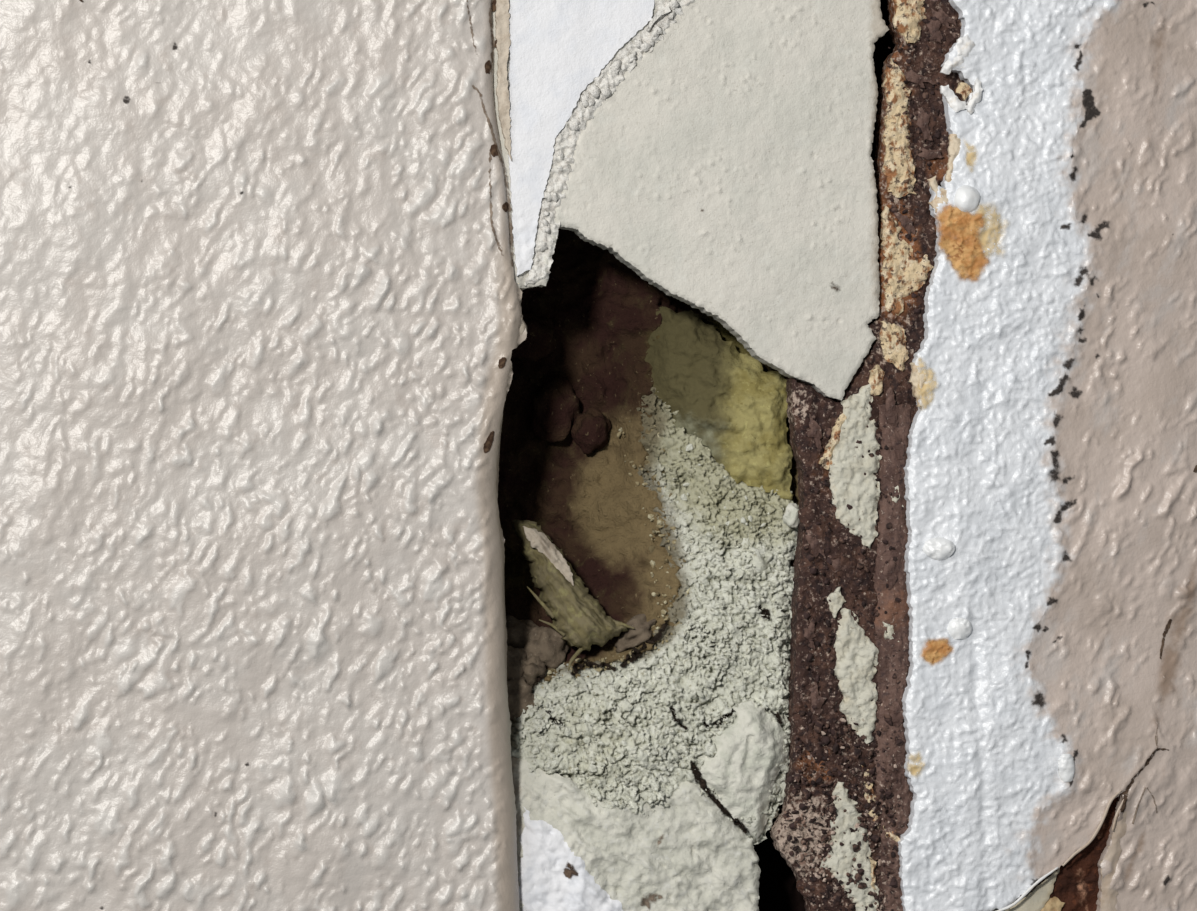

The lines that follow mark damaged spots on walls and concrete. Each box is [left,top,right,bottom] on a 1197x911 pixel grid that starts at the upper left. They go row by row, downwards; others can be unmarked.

peeling [940,34,983,114]
rust [915,108,944,160]
peeling [927,134,961,213]
rust [936,205,1001,281]
spalling [483,228,806,845]
rust [805,530,851,578]
rust [922,639,953,664]
rust [887,698,904,727]
rust [908,754,922,775]
flaking render [563,863,578,878]
flaking render [641,894,662,909]